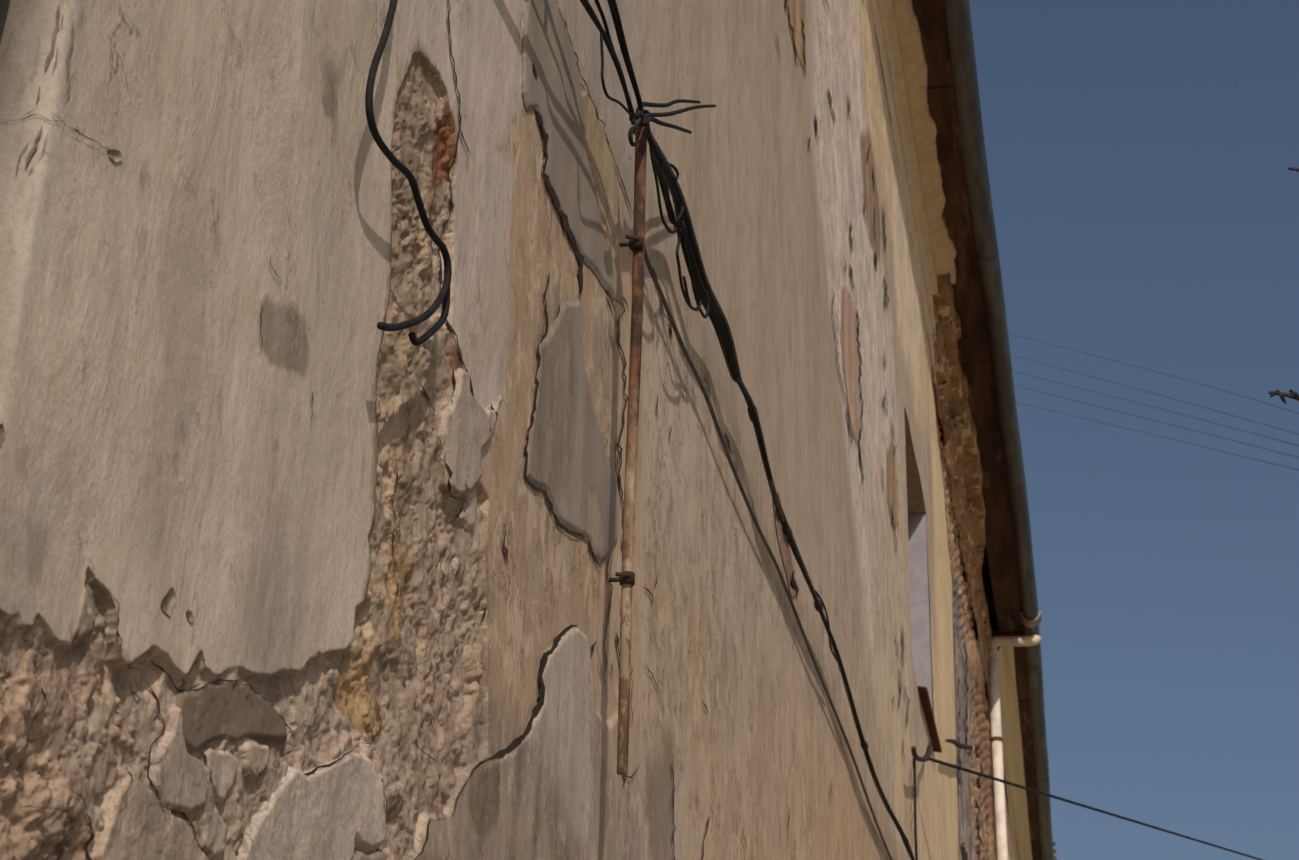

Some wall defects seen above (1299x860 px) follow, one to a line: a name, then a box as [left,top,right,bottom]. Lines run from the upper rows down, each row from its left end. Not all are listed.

peeling [776,0,807,74]
peeling [581,89,625,312]
peeling [829,132,889,482]
flaking render [0,42,507,860]
peeling [881,395,898,552]
peeling [893,626,910,723]
flaking render [932,273,997,860]
crack [671,766,710,860]